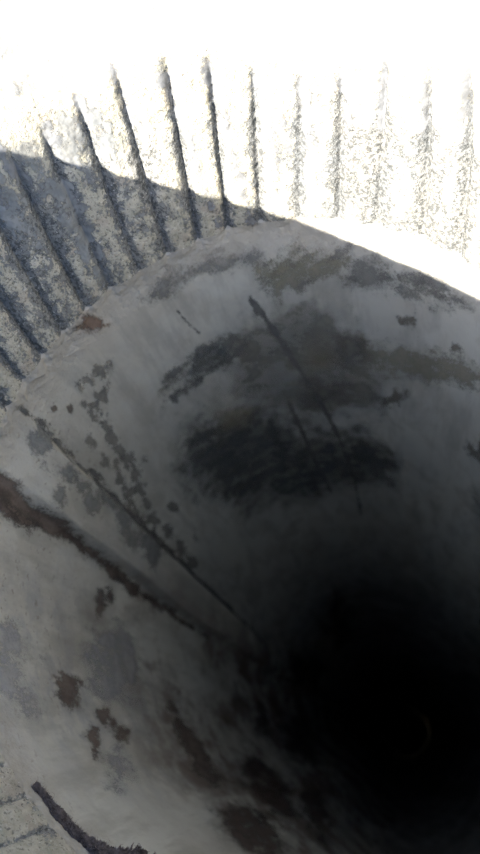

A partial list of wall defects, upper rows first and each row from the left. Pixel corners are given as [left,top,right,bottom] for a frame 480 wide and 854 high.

water stain [159,346,227,403]
water stain [175,407,393,515]
crack [0,406,269,648]
water stain [167,699,221,788]
water stain [219,756,334,854]